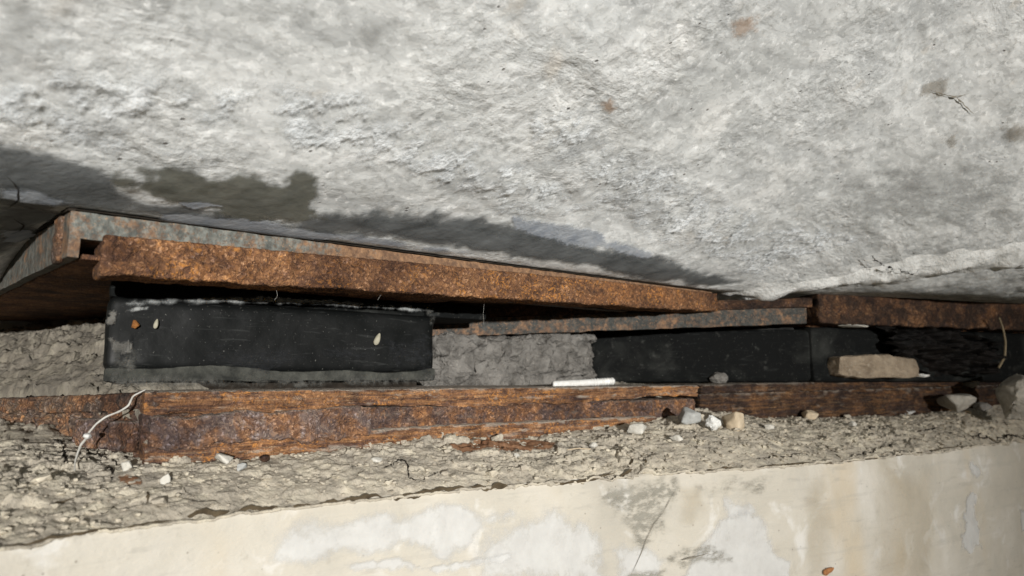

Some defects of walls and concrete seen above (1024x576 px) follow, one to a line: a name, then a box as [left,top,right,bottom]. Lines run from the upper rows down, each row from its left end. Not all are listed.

crack [929,89,974,114]
water stain [0,146,733,286]
corrosion [449,439,555,453]